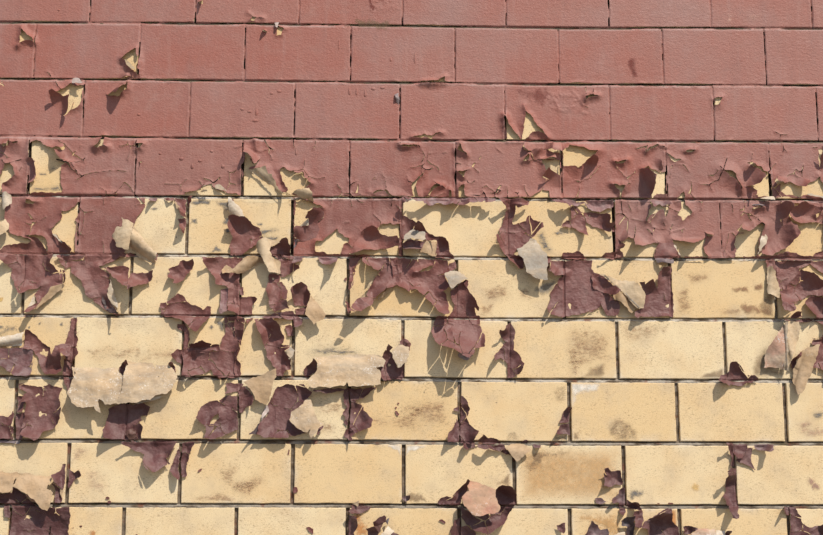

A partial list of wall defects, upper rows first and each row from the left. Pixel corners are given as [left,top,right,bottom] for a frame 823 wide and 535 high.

peeling [0,130,153,316]
peeling [362,125,544,269]
peeling [716,140,823,325]
peeling [149,135,485,441]
peeling [0,318,78,444]
peeling [494,323,524,378]
peeling [102,403,195,480]
peeling [448,396,510,455]
peeling [0,464,81,535]
peeling [437,479,517,535]
peeling [595,468,698,535]
peeling [723,443,774,519]